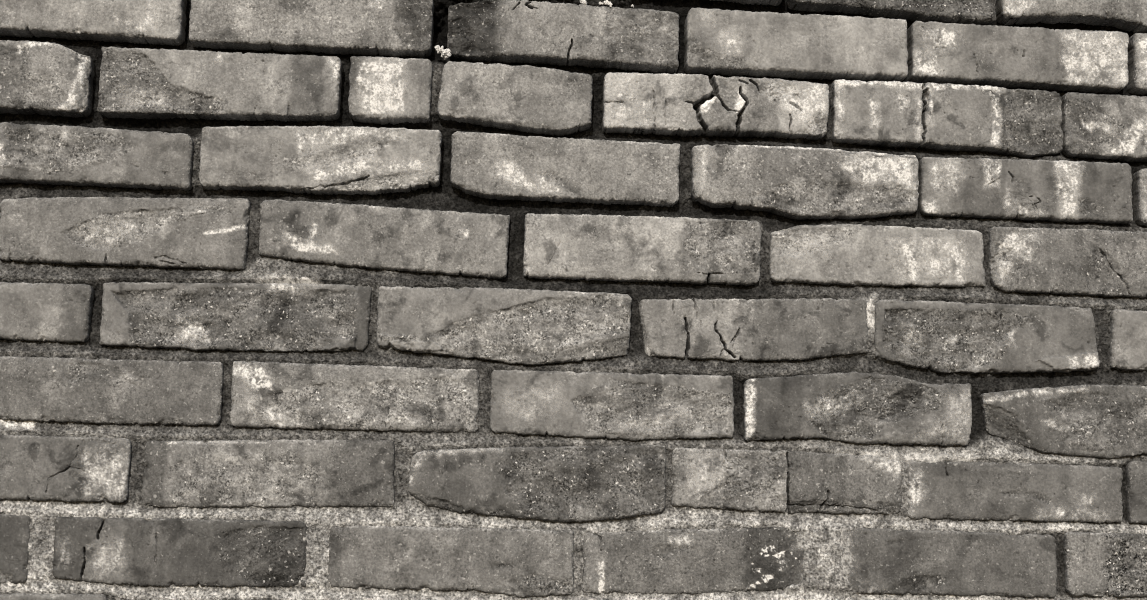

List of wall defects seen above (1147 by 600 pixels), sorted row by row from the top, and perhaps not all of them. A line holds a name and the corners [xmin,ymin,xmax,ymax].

crack [512,1,538,10]
crack [652,75,759,137]
crack [1099,248,1132,298]
crack [672,272,740,359]
crack [45,445,89,493]